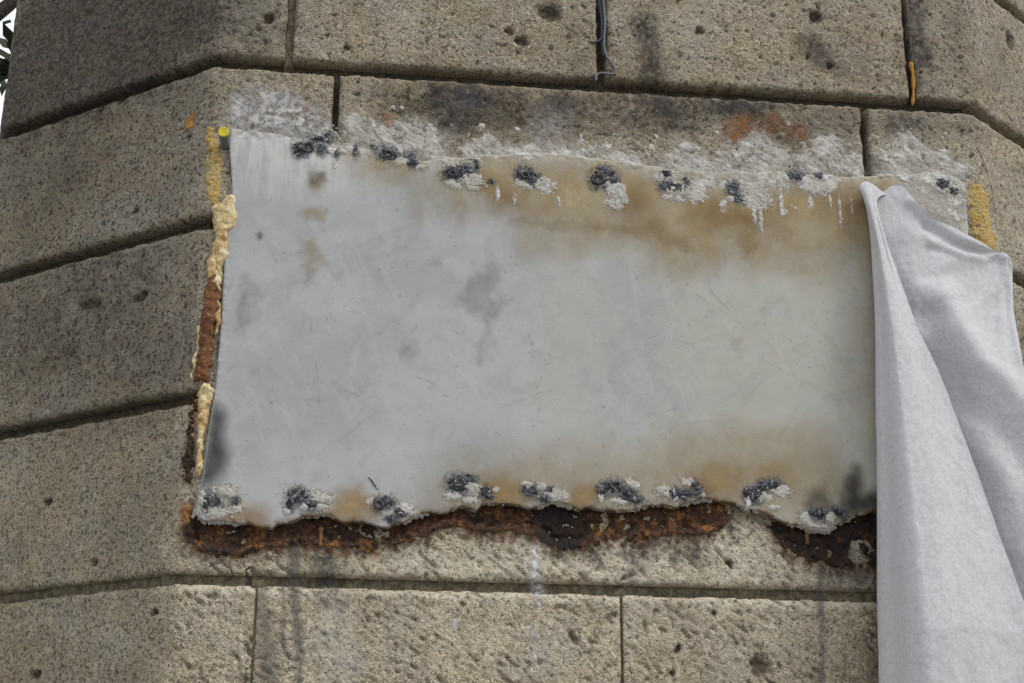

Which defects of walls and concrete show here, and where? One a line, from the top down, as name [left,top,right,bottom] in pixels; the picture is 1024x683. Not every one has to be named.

water stain [311,83,979,265]
rust [179,479,733,565]
rust [767,513,877,576]